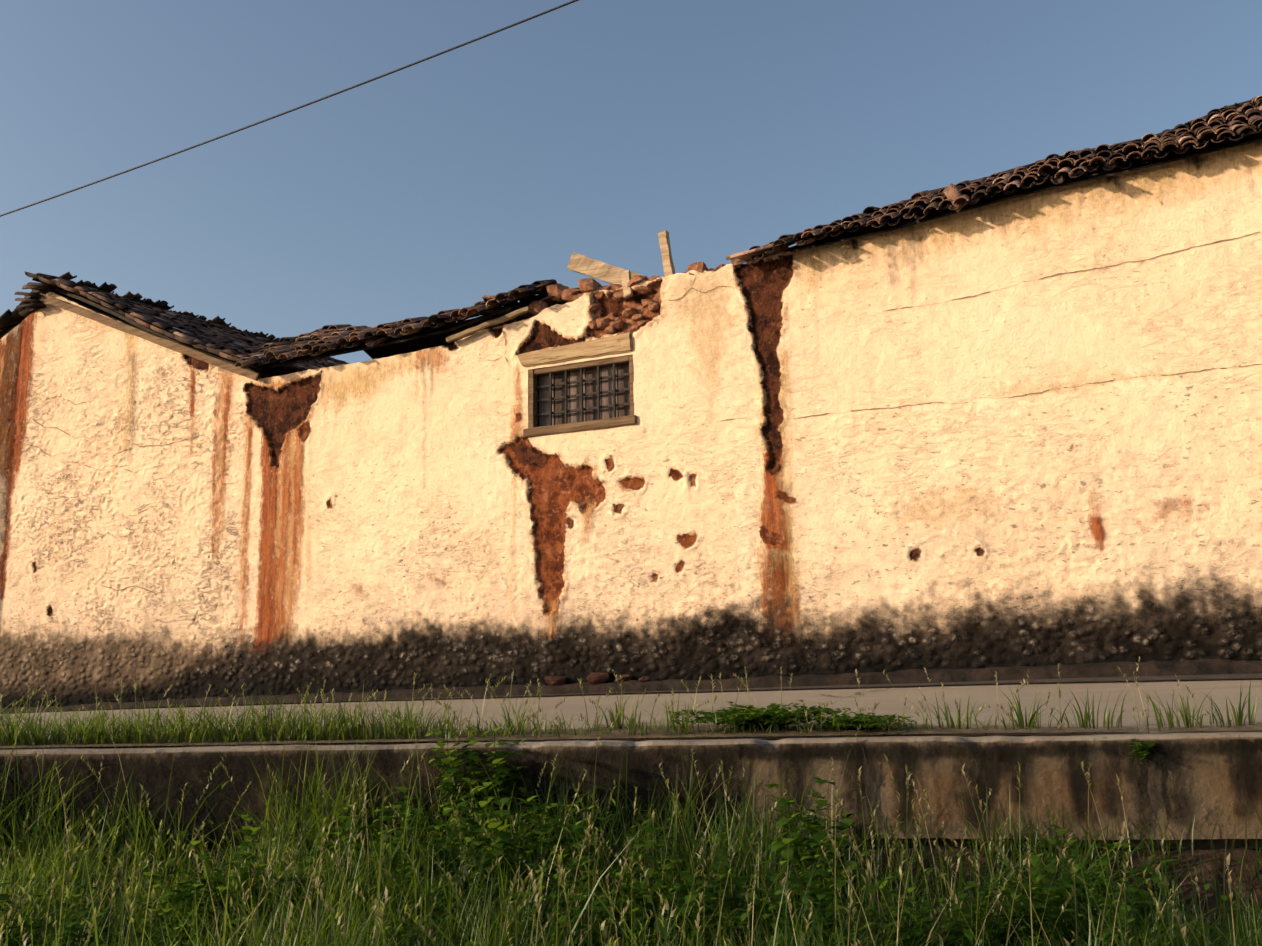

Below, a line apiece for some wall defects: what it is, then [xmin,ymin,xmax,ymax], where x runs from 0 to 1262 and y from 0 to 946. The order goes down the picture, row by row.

corrosion [0,312,34,600]
corrosion [211,372,232,559]
corrosion [240,413,309,650]
corrosion [260,379,301,391]
spalling [243,371,322,468]
spalling [481,280,662,355]
spalling [499,436,644,634]
spalling [675,531,696,572]
spalling [733,252,793,463]
crack [785,364,1262,419]
crack [882,232,1259,312]
damp [0,574,1262,709]